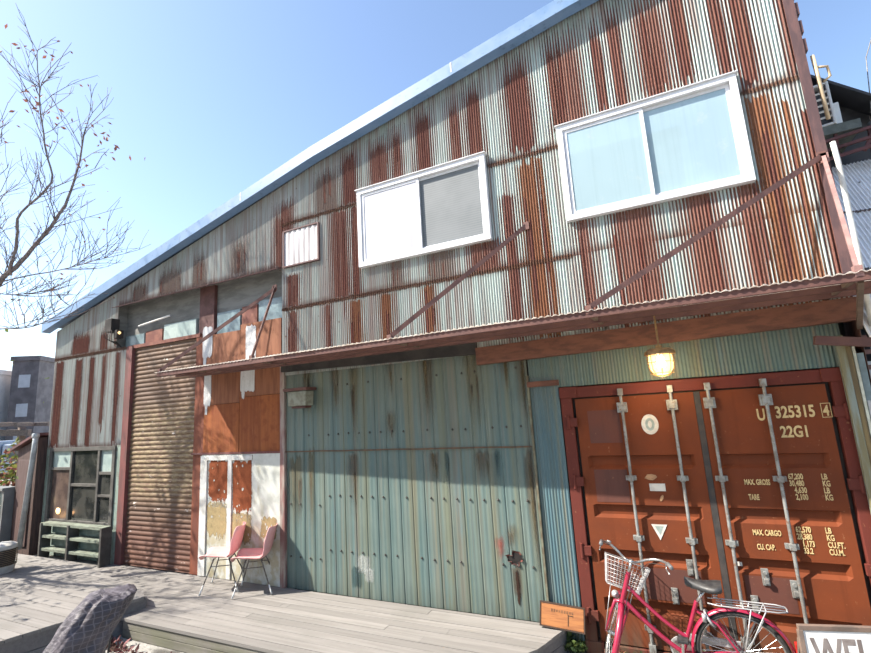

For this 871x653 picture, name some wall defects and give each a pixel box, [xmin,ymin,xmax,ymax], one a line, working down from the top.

corrosion [271,0,699,353]
corrosion [673,0,843,295]
corrosion [158,251,208,298]
corrosion [231,238,248,277]
corrosion [49,326,126,448]
peeling [206,460,277,545]